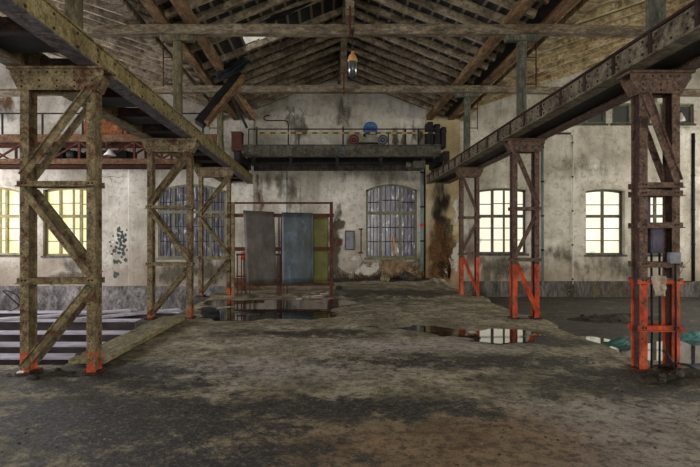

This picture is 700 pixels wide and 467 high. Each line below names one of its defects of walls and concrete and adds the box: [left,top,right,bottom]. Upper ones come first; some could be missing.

damp [432,185,450,233]
peeling [107,226,128,278]
spalling [343,256,424,279]